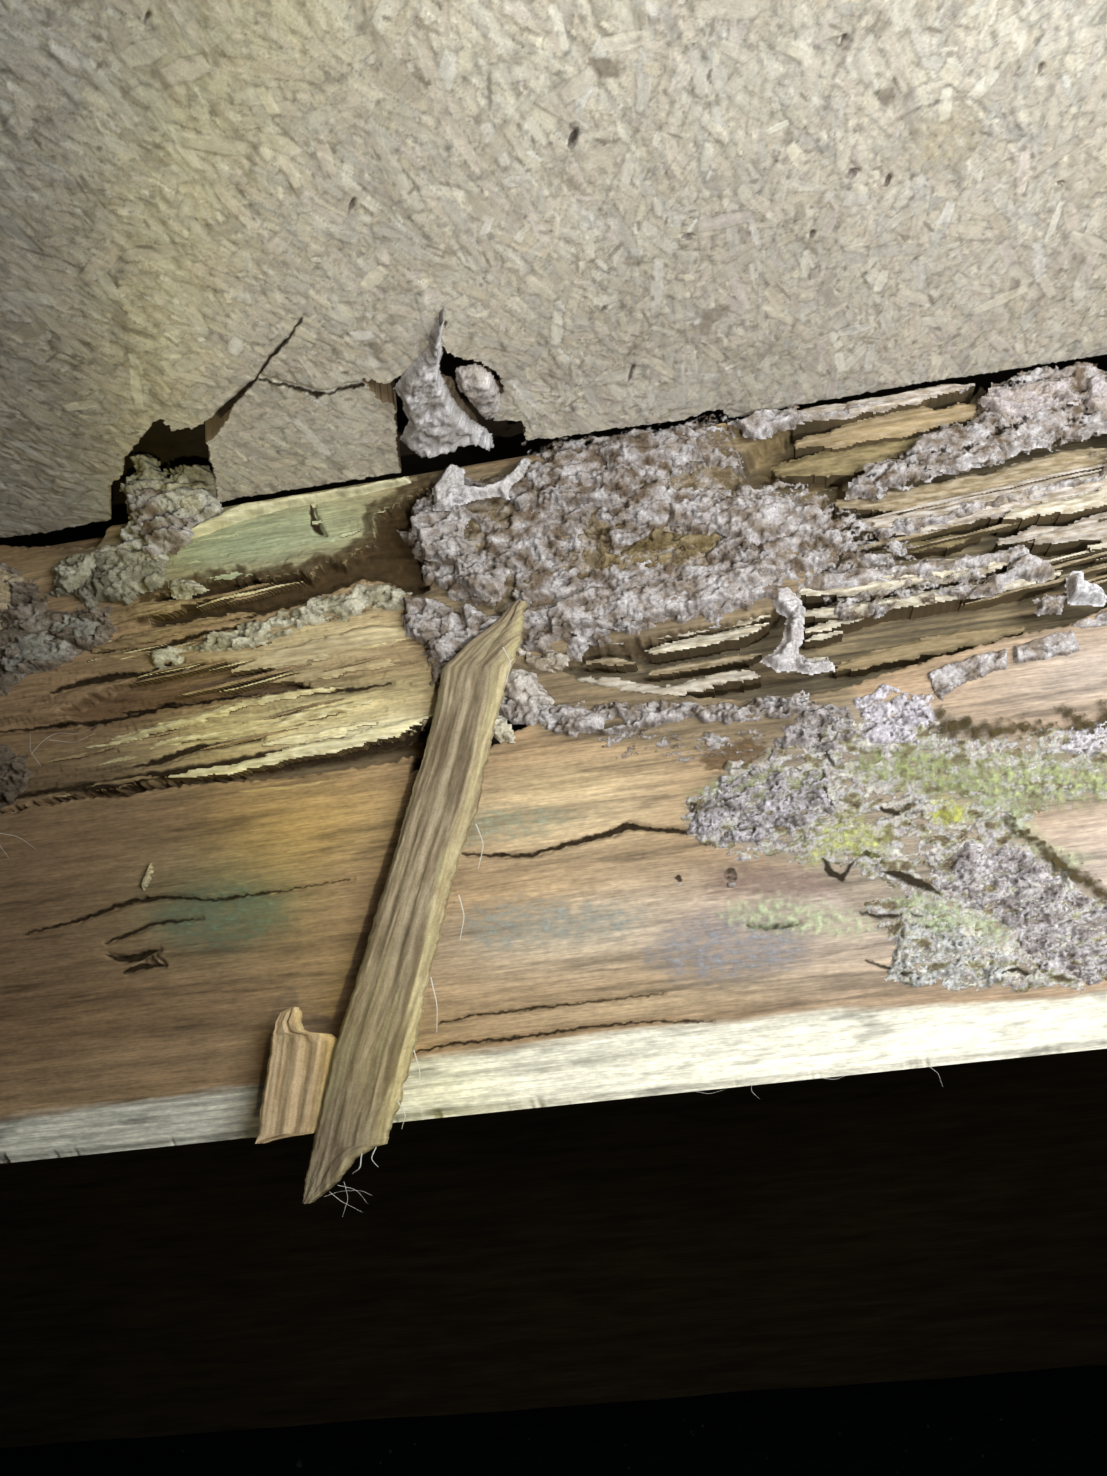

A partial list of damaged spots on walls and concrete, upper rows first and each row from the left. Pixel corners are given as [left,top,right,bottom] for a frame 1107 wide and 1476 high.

crack [216,317,365,418]
crack [0,619,264,733]
crack [325,682,392,694]
crack [0,722,430,802]
water stain [681,700,1107,993]